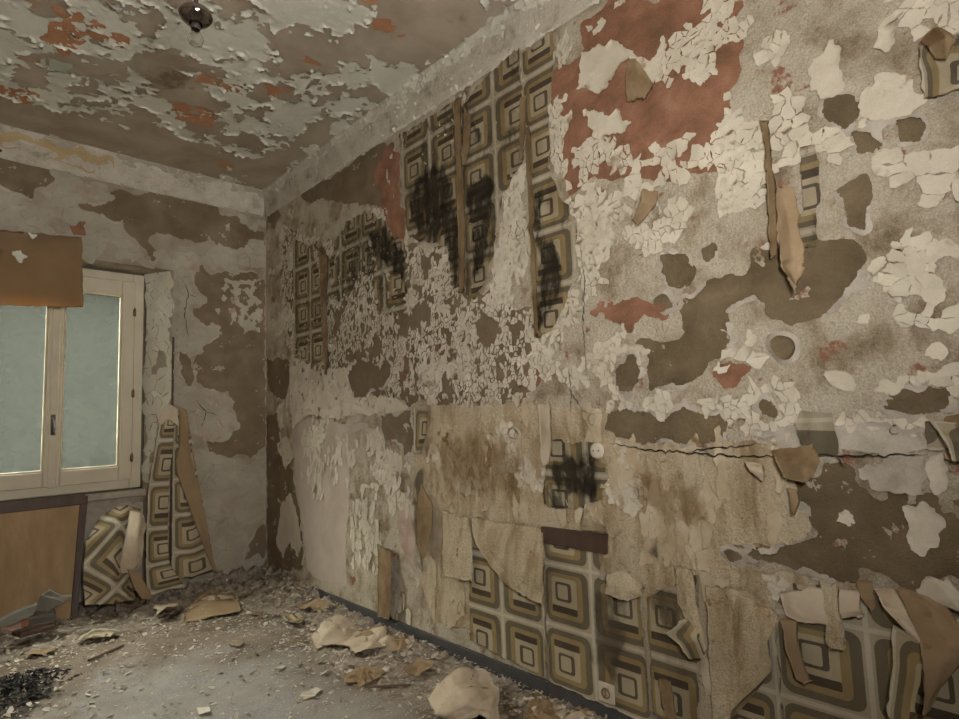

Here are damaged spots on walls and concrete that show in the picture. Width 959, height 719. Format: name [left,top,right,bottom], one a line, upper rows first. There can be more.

peeling [525,23,572,69]
peeling [576,0,754,94]
peeling [753,30,790,67]
peeling [873,0,959,53]
peeling [0,0,550,221]
peeling [768,39,959,236]
mould [409,165,495,283]
mould [369,226,406,291]
mould [534,191,561,330]
mould [552,457,597,498]
crack [610,443,774,458]
crack [818,453,927,468]